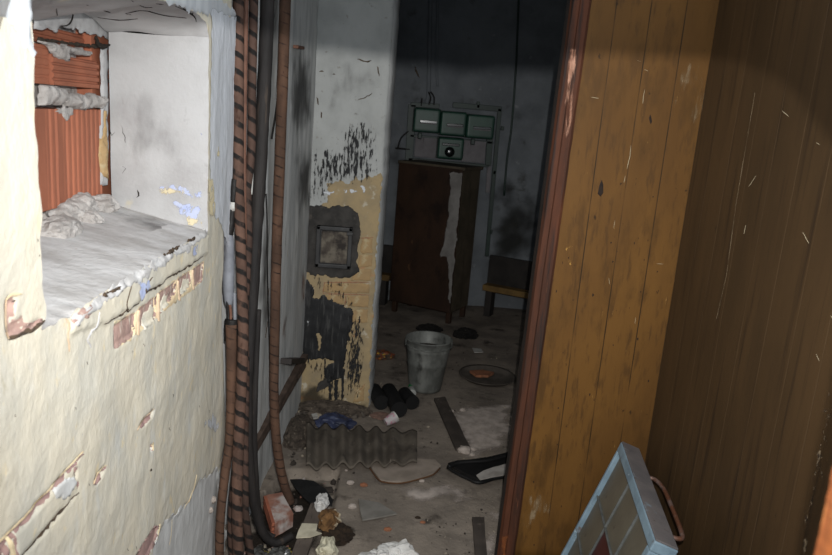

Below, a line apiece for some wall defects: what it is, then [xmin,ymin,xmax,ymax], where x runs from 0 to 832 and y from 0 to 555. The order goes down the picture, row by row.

peeling [0,0,37,57]
peeling [71,0,236,349]
flaking render [4,292,46,340]
peeling [301,173,383,407]
flaking render [136,467,227,555]